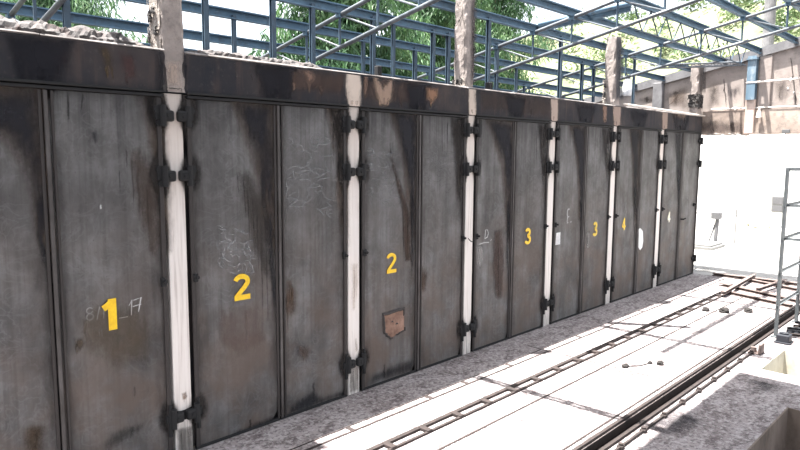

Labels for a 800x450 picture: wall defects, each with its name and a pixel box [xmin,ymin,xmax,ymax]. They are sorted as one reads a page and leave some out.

water stain [390,149,414,263]
corrosion [494,232,503,297]